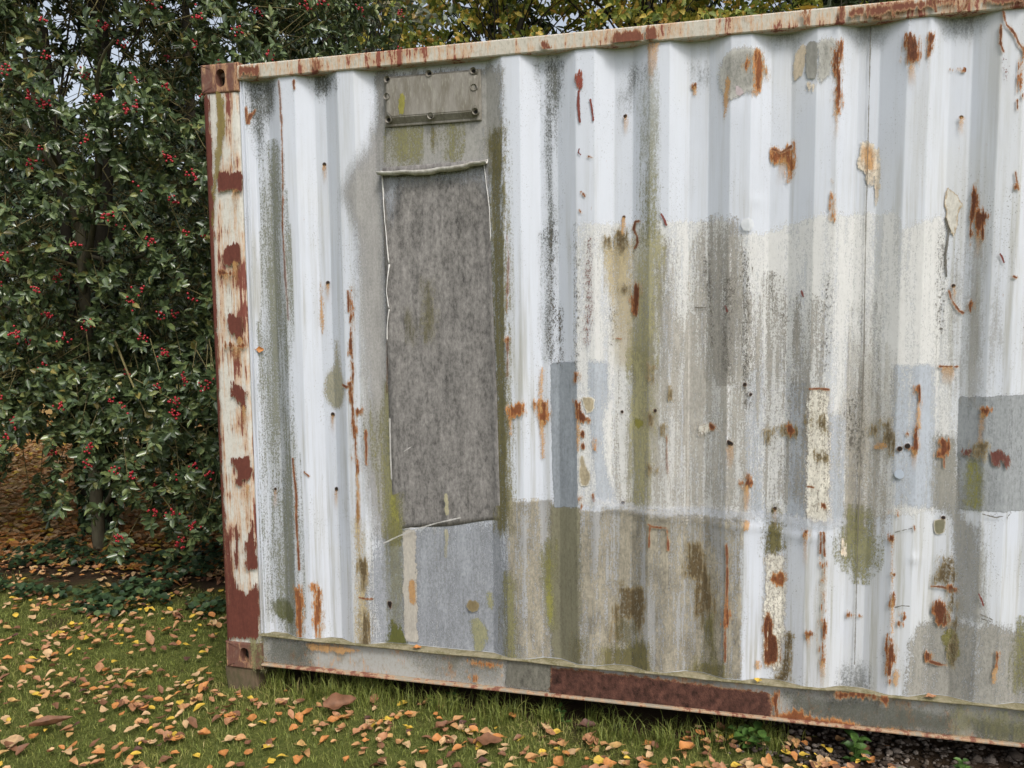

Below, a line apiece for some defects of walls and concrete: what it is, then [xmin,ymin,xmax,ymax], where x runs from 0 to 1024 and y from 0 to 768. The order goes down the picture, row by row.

peeling [736,48,768,96]
peeling [793,37,844,114]
rust [904,31,935,69]
rust [770,141,796,183]
peeling [857,141,881,206]
damp [535,56,594,361]
peeling [944,188,963,277]
rust [969,185,989,246]
rust [506,368,551,459]
rust [292,290,376,654]
damp [700,612,717,661]
rust [549,668,860,726]